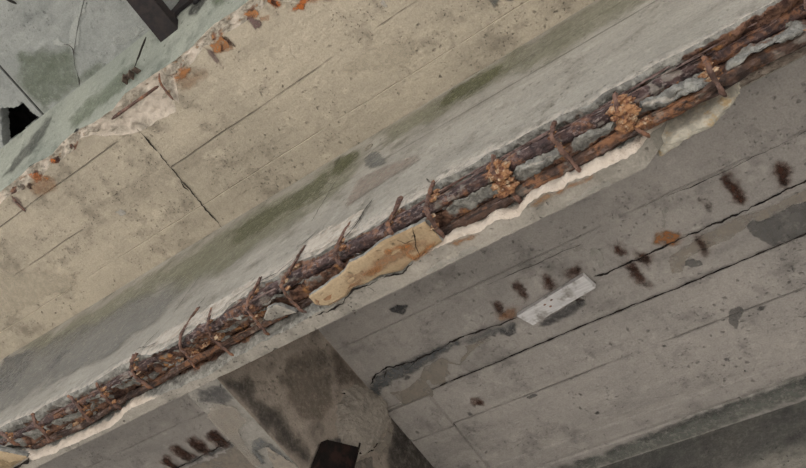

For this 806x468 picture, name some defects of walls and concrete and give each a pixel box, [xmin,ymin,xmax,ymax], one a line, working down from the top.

spalling [0,0,300,204]
spalling [427,0,806,252]
rust [605,94,653,135]
crack [137,129,221,227]
rust [720,173,746,204]
rust [774,162,791,186]
damp [747,202,806,246]
spalling [0,194,443,468]
crack [371,318,515,384]
crack [434,233,806,389]
damp [729,306,743,328]
rust [161,430,229,468]